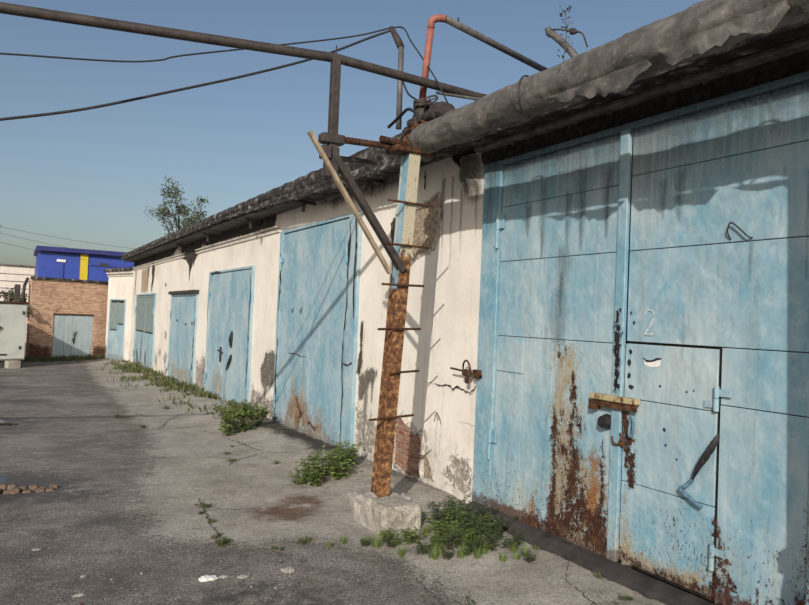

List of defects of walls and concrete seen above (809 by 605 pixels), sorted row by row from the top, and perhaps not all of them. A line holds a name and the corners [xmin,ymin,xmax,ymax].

damp [443,49,809,222]
spalling [411,191,442,263]
damp [260,351,275,397]
corrosion [285,374,329,440]
damp [358,367,377,419]
crack [425,381,476,395]
spalling [393,410,473,499]
corrosion [520,340,608,557]
corrosion [621,410,636,504]
crack [565,561,597,605]
corrosion [617,513,809,605]